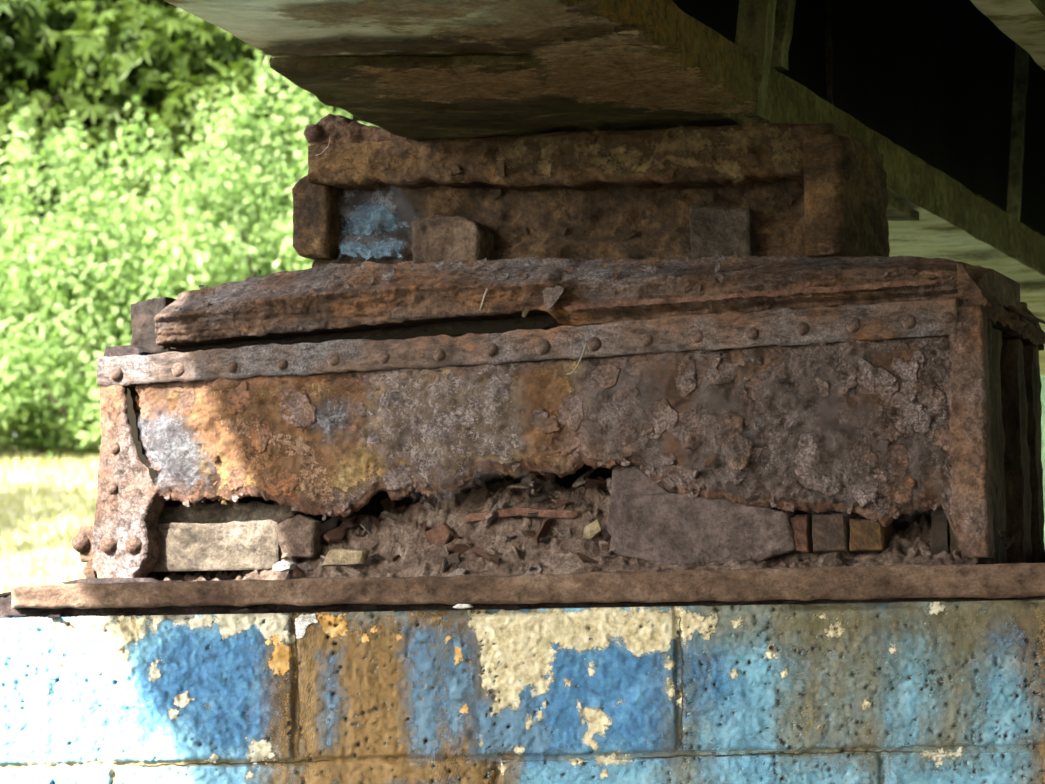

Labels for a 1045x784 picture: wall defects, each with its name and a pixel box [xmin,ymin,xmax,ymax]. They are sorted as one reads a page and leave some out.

water stain [275,0,494,28]
corrosion [103,345,154,357]
crack [153,320,549,354]
corrosion [155,387,367,505]
peeling [382,464,440,498]
corrosion [583,518,604,540]
corrosion [61,559,157,584]
peeling [25,613,295,682]
peeling [467,606,718,730]
peeling [168,690,212,719]
corrosion [229,605,534,784]
peeling [569,702,632,777]